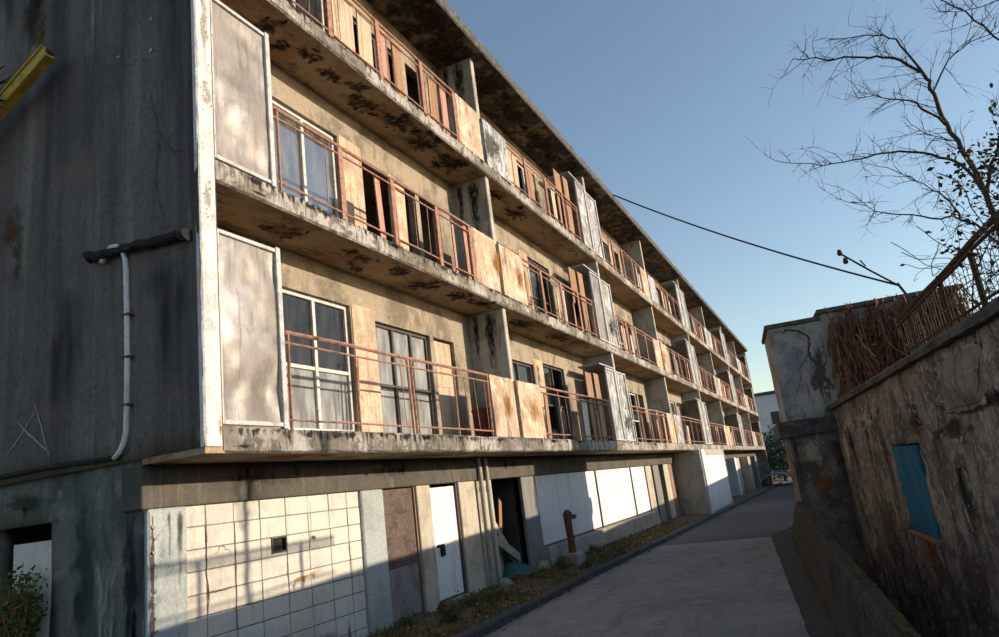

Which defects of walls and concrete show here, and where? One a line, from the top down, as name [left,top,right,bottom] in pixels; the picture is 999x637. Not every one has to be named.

water stain [342,46,591,250]
crack [773,329,824,394]
crack [904,351,999,528]
water stain [95,521,138,637]
water stain [168,514,183,548]